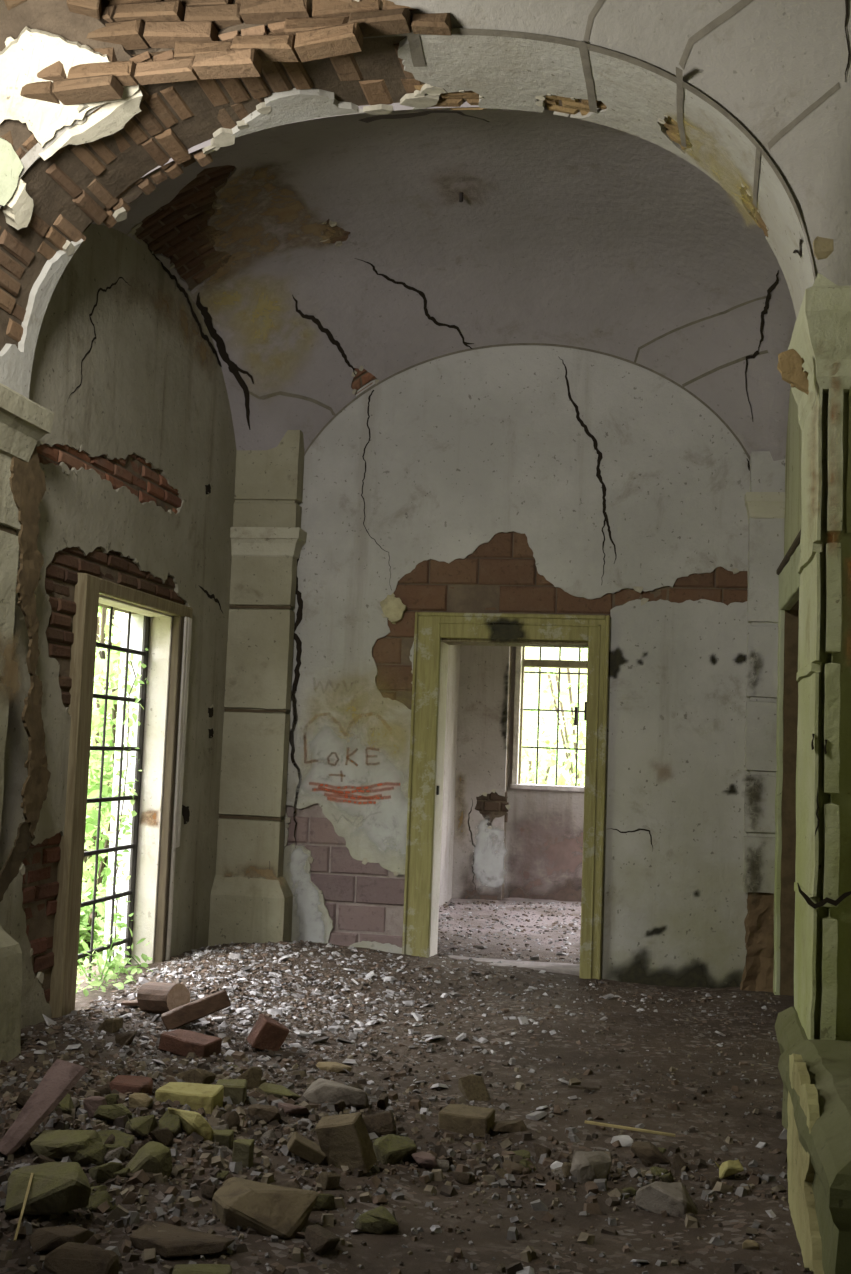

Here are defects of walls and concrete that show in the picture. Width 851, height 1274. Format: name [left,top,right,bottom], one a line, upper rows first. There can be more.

crack [843,0,851,82]
crack [146,242,254,430]
crack [354,258,474,349]
crack [558,356,616,585]
flaking render [372,532,748,710]
spalling [9,441,192,1003]
flaking render [284,803,405,948]
flaking render [475,789,510,830]
crack [797,883,851,909]